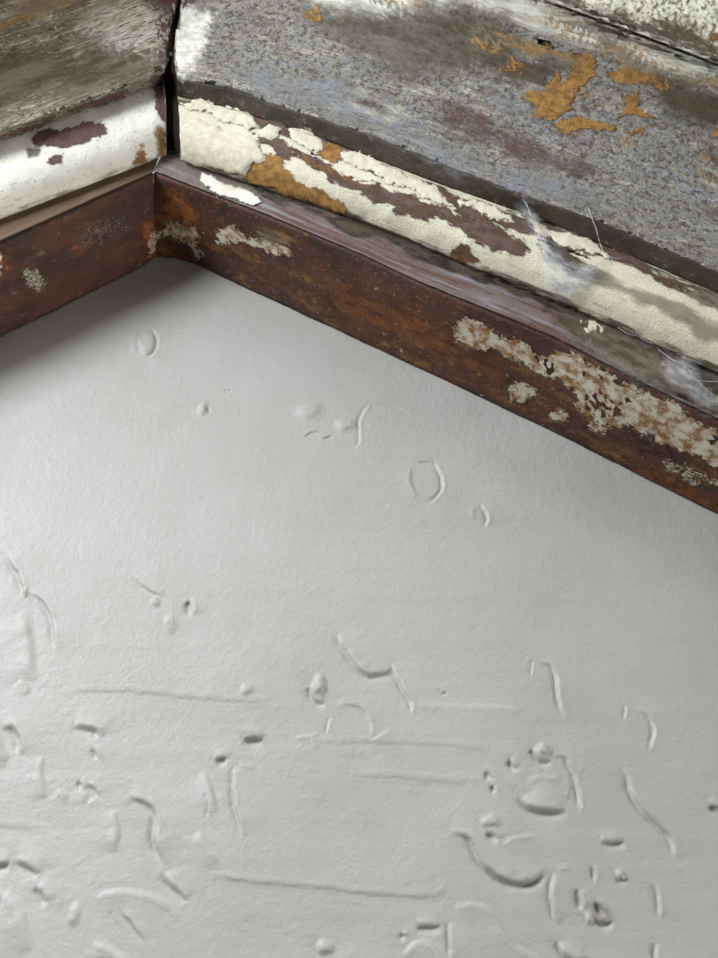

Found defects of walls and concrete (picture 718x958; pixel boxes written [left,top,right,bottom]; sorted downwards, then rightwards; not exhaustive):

corrosion [552,13,681,79]
peeling [0,89,137,165]
peeling [147,74,166,121]
corrosion [141,190,204,260]
peeling [180,98,718,307]
corrosion [0,253,11,281]
peeling [452,317,718,486]